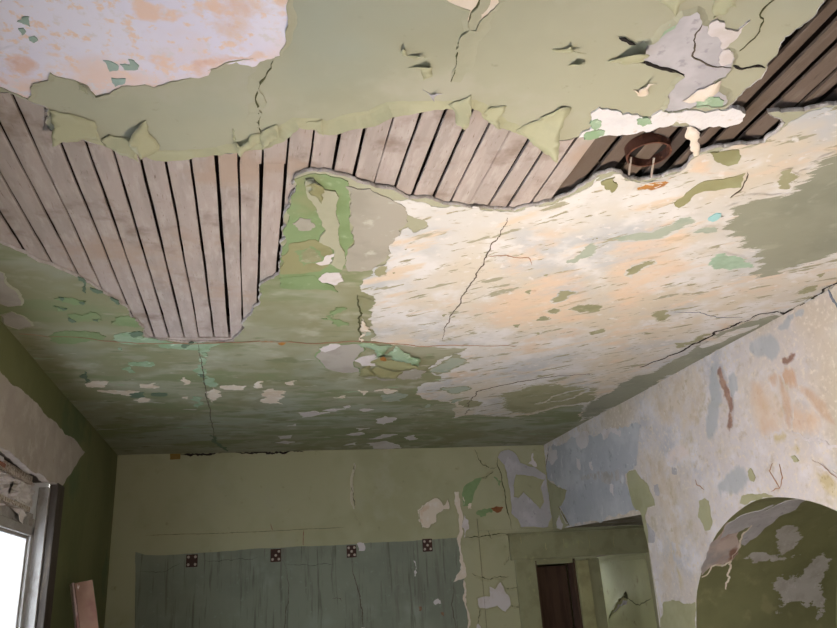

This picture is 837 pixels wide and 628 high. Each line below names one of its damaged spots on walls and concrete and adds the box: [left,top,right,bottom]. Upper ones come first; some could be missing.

crack [443,0,504,83]
peeling [0,0,837,418]
crack [25,295,479,457]
peeling [276,395,373,444]
peeling [344,416,418,449]
peeling [494,422,641,530]
crack [578,283,837,421]
crack [769,463,783,492]
peeling [418,478,512,628]
peeling [701,499,836,621]